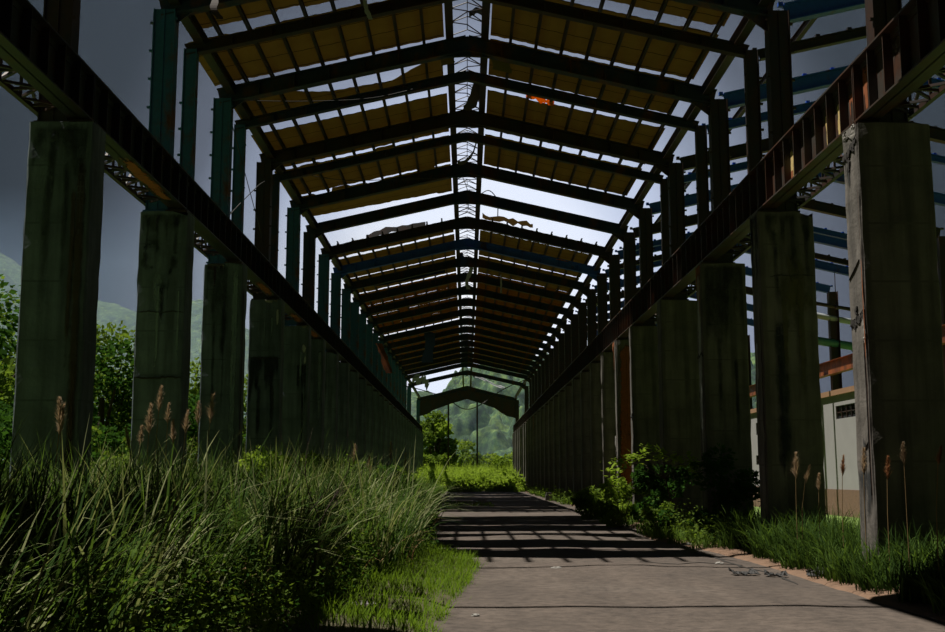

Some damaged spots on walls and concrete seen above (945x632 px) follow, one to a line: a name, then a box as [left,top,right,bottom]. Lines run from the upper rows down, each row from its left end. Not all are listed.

spalling [842,124,855,141]
corrosion [825,65,877,145]